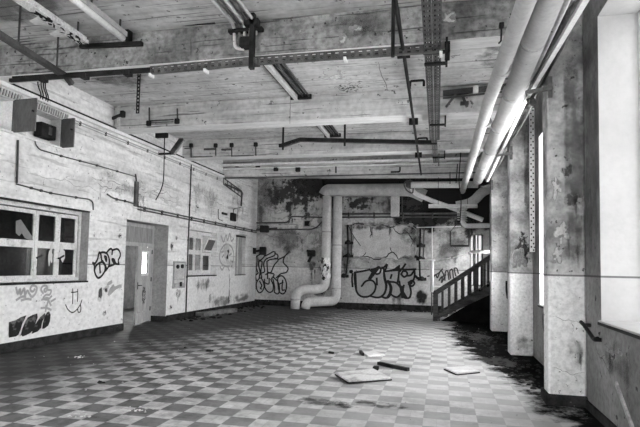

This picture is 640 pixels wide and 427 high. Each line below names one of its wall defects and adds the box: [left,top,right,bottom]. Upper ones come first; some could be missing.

peeling [30,11,88,45]
water stain [258,179,325,223]
crack [352,223,416,260]
peeling [552,221,570,264]